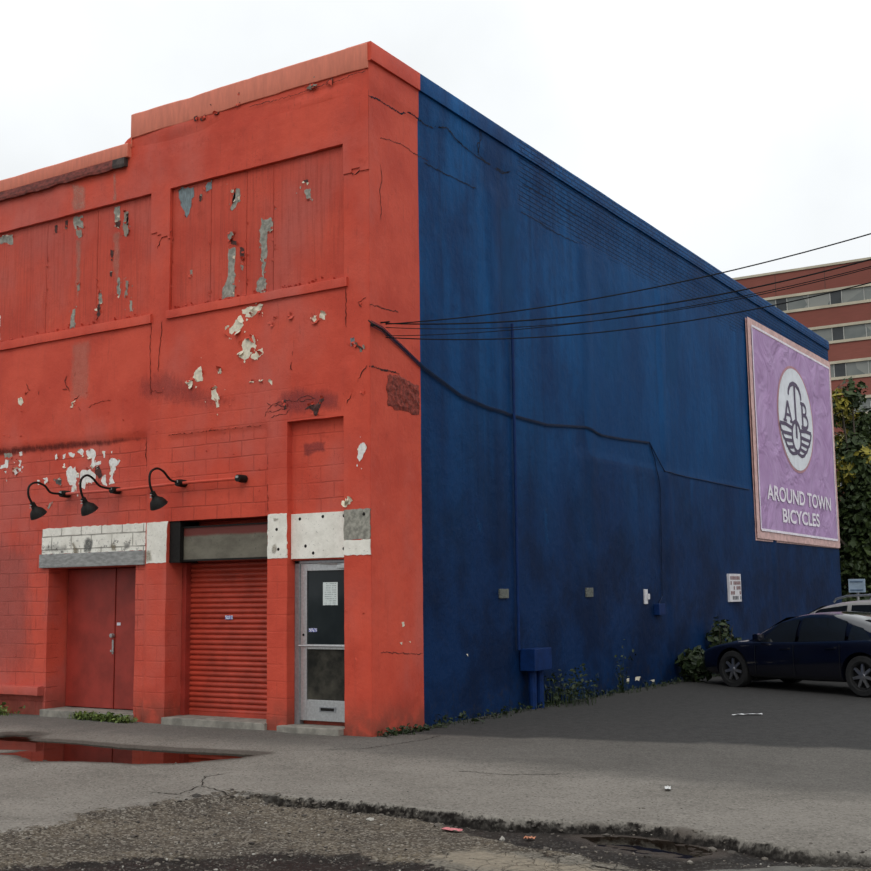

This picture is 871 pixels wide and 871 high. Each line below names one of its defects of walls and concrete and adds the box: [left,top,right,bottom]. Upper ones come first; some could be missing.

crack [370,96,577,217]
peeling [54,215,84,238]
peeling [114,206,130,237]
peeling [178,179,212,217]
peeling [229,188,241,210]
crack [351,164,382,216]
peeling [36,277,116,334]
peeling [110,249,141,318]
peeling [205,206,294,363]
peeling [185,366,231,415]
peeling [0,435,27,481]
peeling [37,449,120,496]